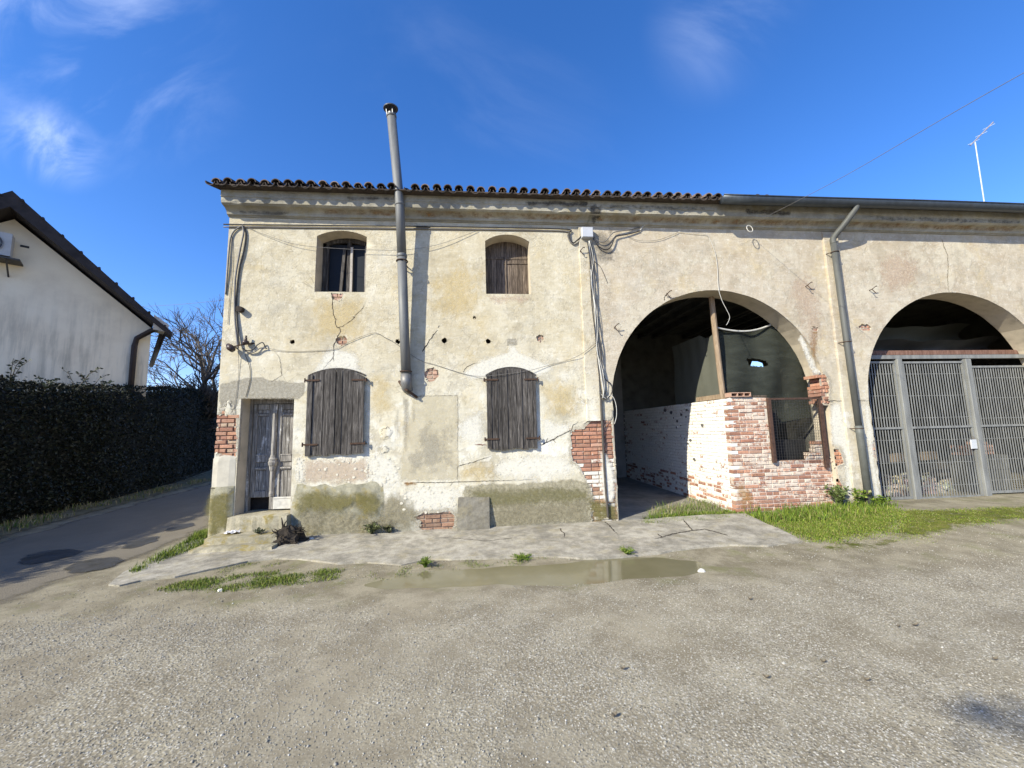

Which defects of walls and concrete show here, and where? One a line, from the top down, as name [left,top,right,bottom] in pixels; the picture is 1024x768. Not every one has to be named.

crack [325,293,362,367]
flaking render [425,368,439,382]
flaking render [214,400,243,461]
water stain [301,511,390,535]
peeling [296,453,457,530]
flaking render [495,417,619,522]